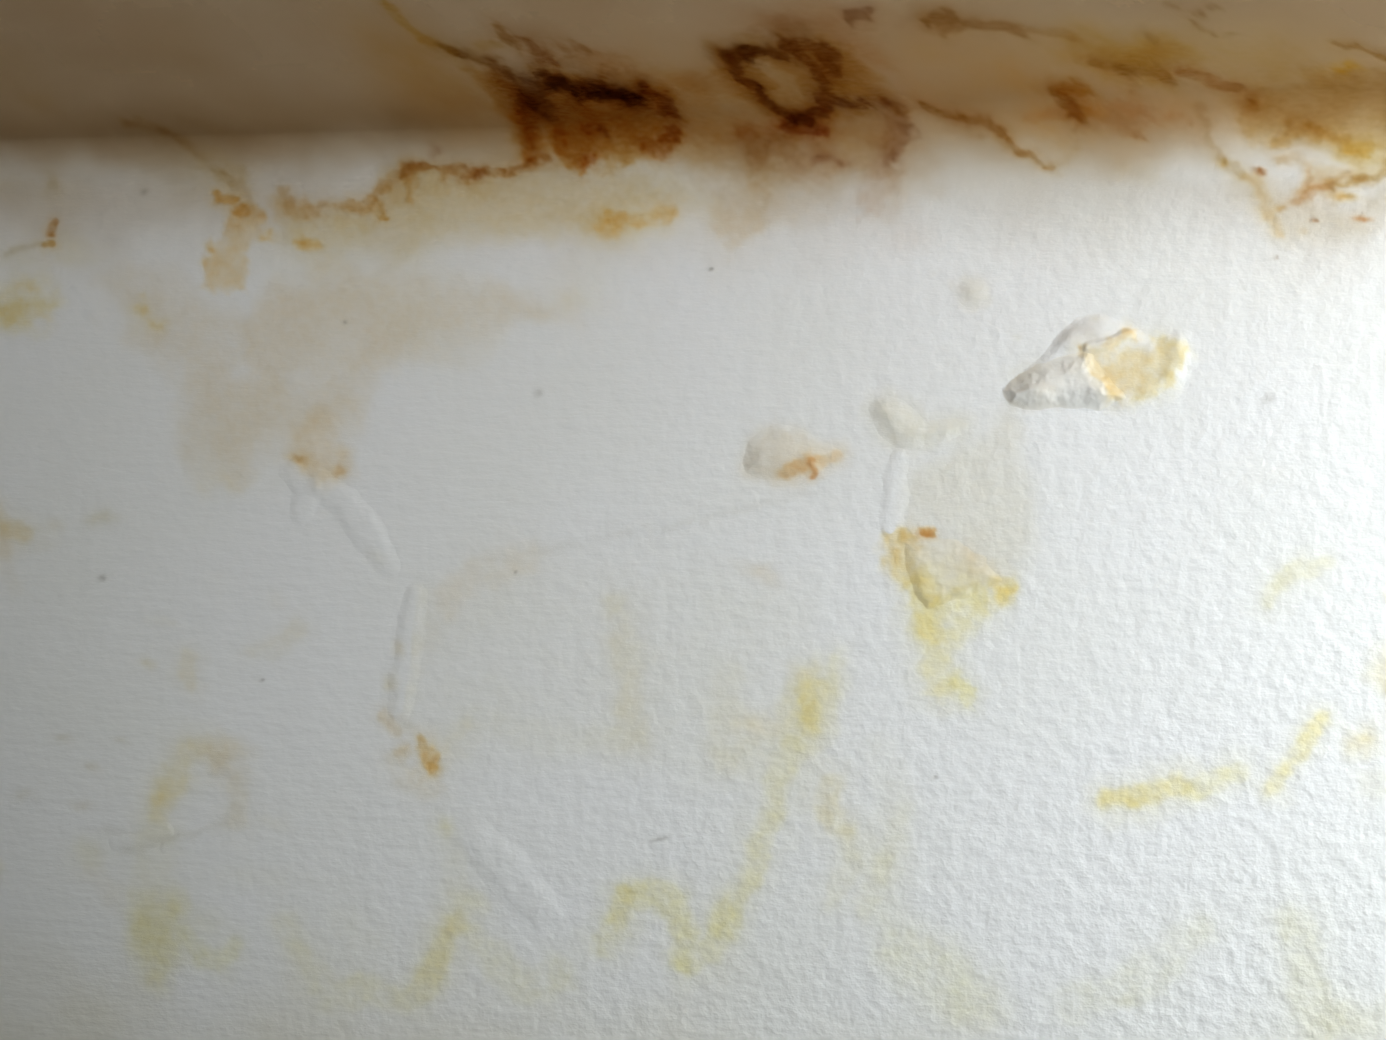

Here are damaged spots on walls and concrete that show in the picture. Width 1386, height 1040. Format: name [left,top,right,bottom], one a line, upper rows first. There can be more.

peeling [1002,313,1200,416]
peeling [904,537,1002,609]